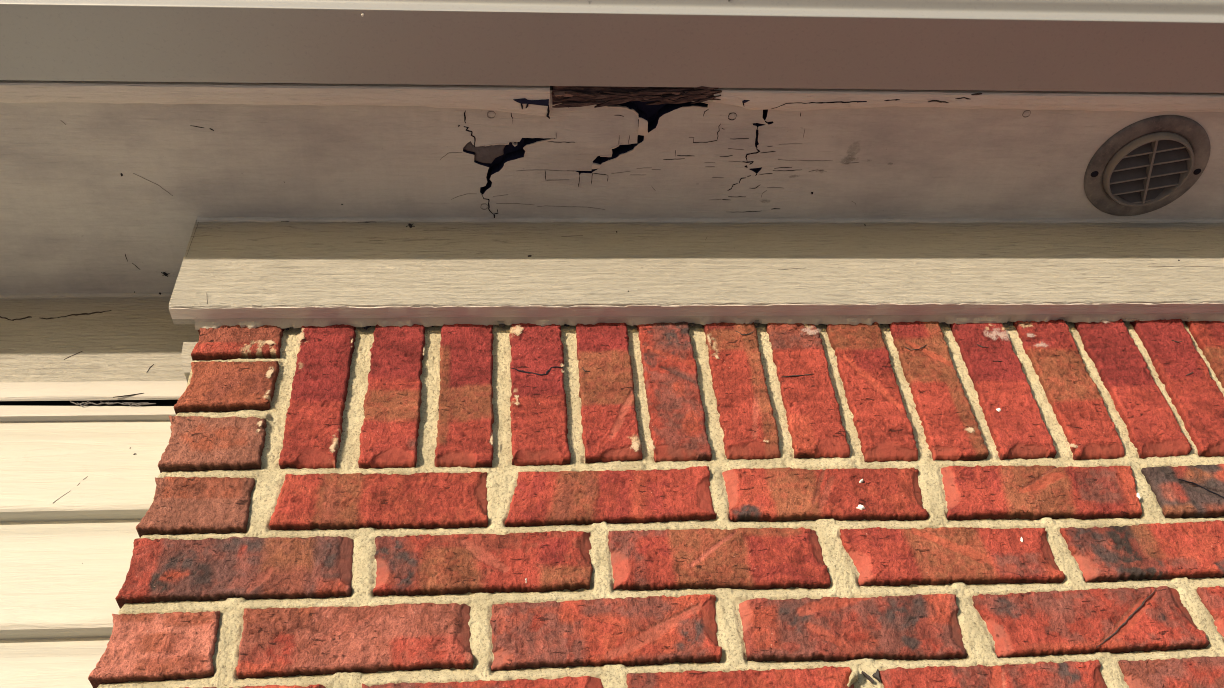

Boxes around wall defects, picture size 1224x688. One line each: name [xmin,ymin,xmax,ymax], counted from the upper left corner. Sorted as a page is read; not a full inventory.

spalling [440,110,575,218]
crack [493,180,605,210]
spalling [545,100,709,187]
crack [612,93,982,212]